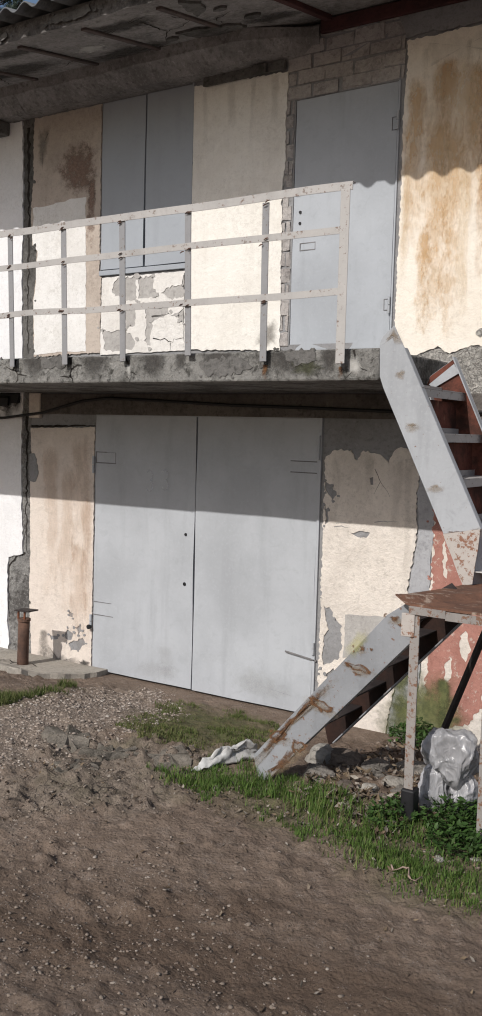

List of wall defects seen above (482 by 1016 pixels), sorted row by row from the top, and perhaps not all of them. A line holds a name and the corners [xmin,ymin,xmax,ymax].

leakage [60,144,95,230]
peeling [97,273,185,352]
crack [8,416,96,617]
peeling [322,479,340,527]
peeling [47,609,87,652]
peeling [317,597,342,677]
rust [265,693,333,772]